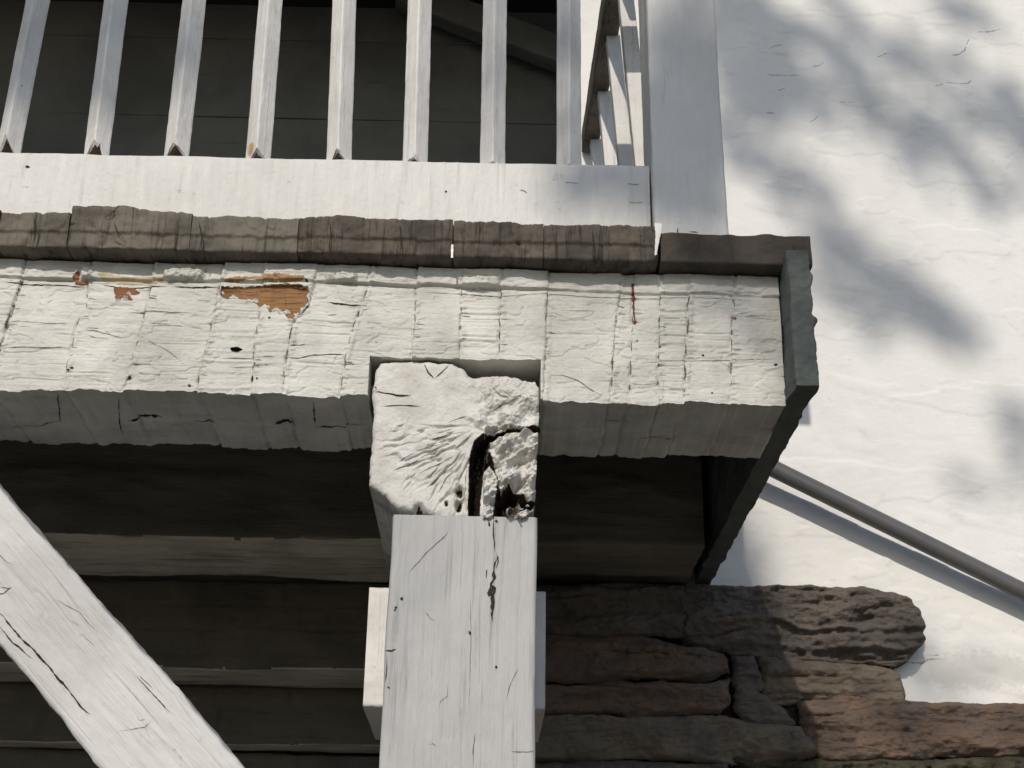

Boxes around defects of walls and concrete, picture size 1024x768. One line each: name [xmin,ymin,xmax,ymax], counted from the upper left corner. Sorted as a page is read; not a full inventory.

peeling [114,287,140,302]
peeling [217,278,309,323]
crack [0,281,371,434]
crack [492,389,525,412]
crack [395,416,467,501]
spalling [495,483,536,517]
crack [468,521,499,662]
crack [0,555,91,716]